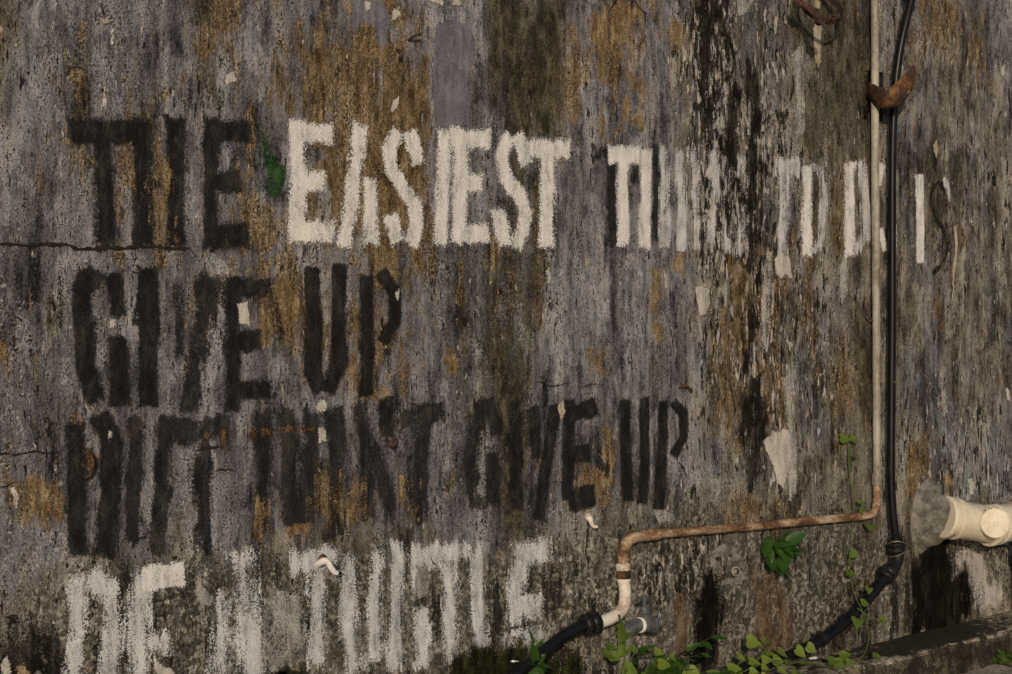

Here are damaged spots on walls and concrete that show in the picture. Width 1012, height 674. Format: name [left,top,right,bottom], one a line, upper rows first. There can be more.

crack [0,242,198,257]
damp [696,0,773,494]
peeling [695,286,710,315]
peeling [705,252,792,488]
efflorescence [783,362,799,501]
damp [908,539,1004,635]
mould [0,612,68,674]